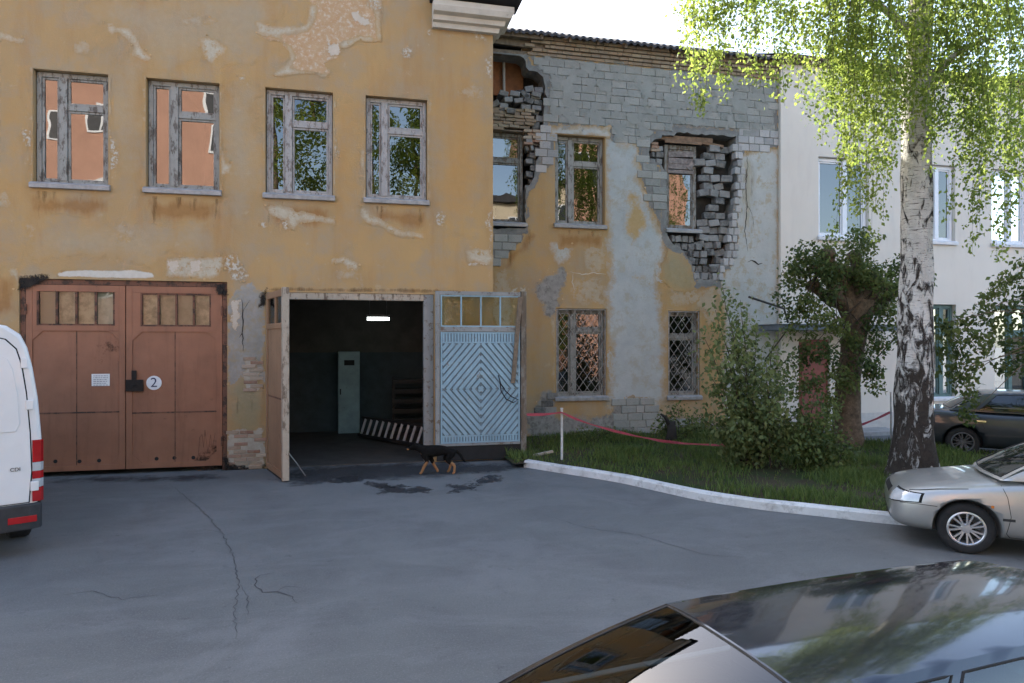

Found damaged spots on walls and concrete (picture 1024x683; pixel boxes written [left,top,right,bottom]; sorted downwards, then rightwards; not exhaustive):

peeling [103,21,152,61]
water stain [0,0,291,316]
peeling [198,34,228,64]
peeling [254,0,383,231]
peeling [359,94,424,240]
spalling [484,46,552,258]
spalling [57,253,269,392]
flaking render [510,124,779,423]
flaking render [226,427,266,469]